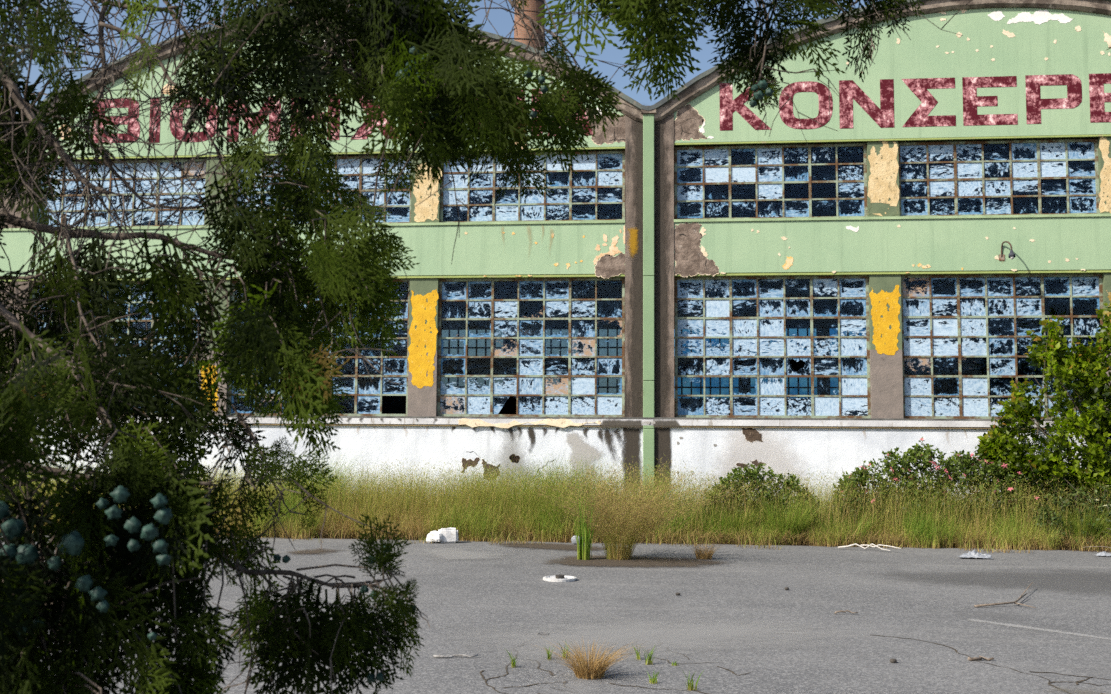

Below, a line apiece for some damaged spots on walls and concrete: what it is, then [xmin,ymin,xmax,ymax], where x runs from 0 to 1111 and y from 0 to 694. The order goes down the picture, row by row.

peeling [988,10,1081,38]
flaking render [674,103,714,142]
peeling [413,163,442,222]
peeling [867,141,901,227]
peeling [1099,137,1111,213]
flaking render [554,226,625,279]
flaking render [674,222,725,277]
peeling [408,289,439,389]
peeling [869,285,901,355]
damp [502,427,559,480]
flaking render [735,459,766,469]
flaking render [741,428,764,443]